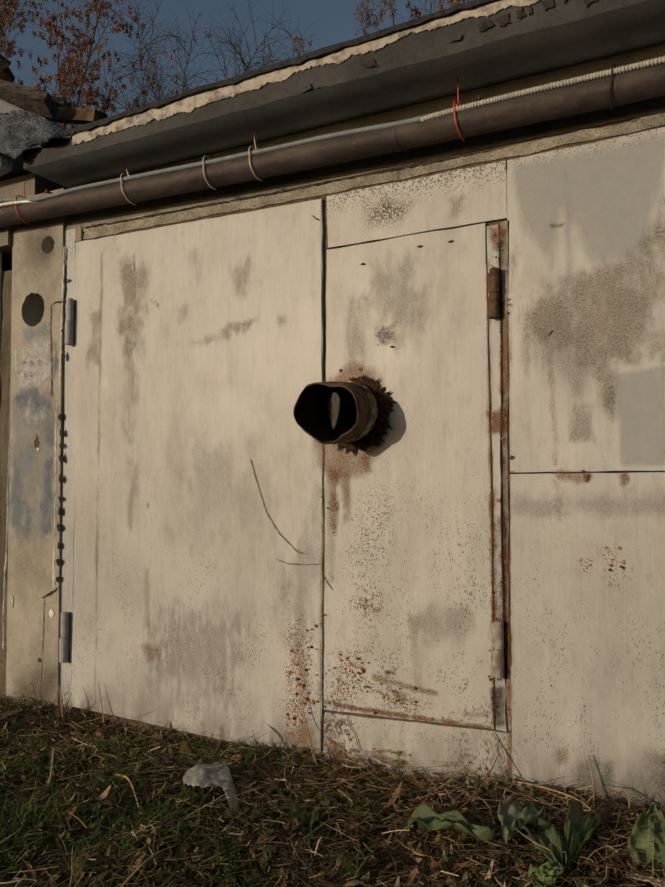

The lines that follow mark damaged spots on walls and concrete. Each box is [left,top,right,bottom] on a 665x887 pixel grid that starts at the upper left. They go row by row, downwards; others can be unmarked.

peeling [72,0,567,146]
corrosion [489,227,507,271]
corrosion [285,282,513,760]